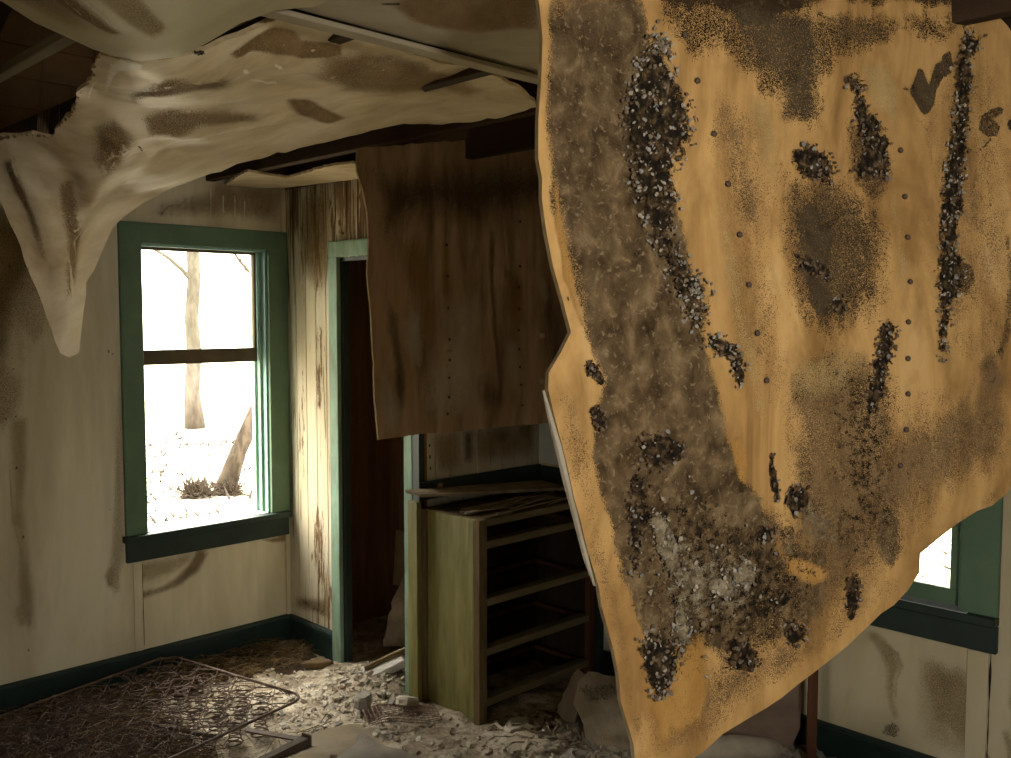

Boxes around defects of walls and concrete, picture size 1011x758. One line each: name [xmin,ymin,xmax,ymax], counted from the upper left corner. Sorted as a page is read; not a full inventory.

leakage [89,107,261,177]
leakage [131,69,276,103]
leakage [284,99,347,125]
leakage [231,26,482,97]
leakage [5,156,45,261]
leakage [59,180,82,301]
peeling [688,274,705,320]
leakage [0,207,52,634]
leakage [556,19,1011,758]
peeling [731,436,748,484]
peeling [773,534,830,587]
peeling [640,507,764,758]